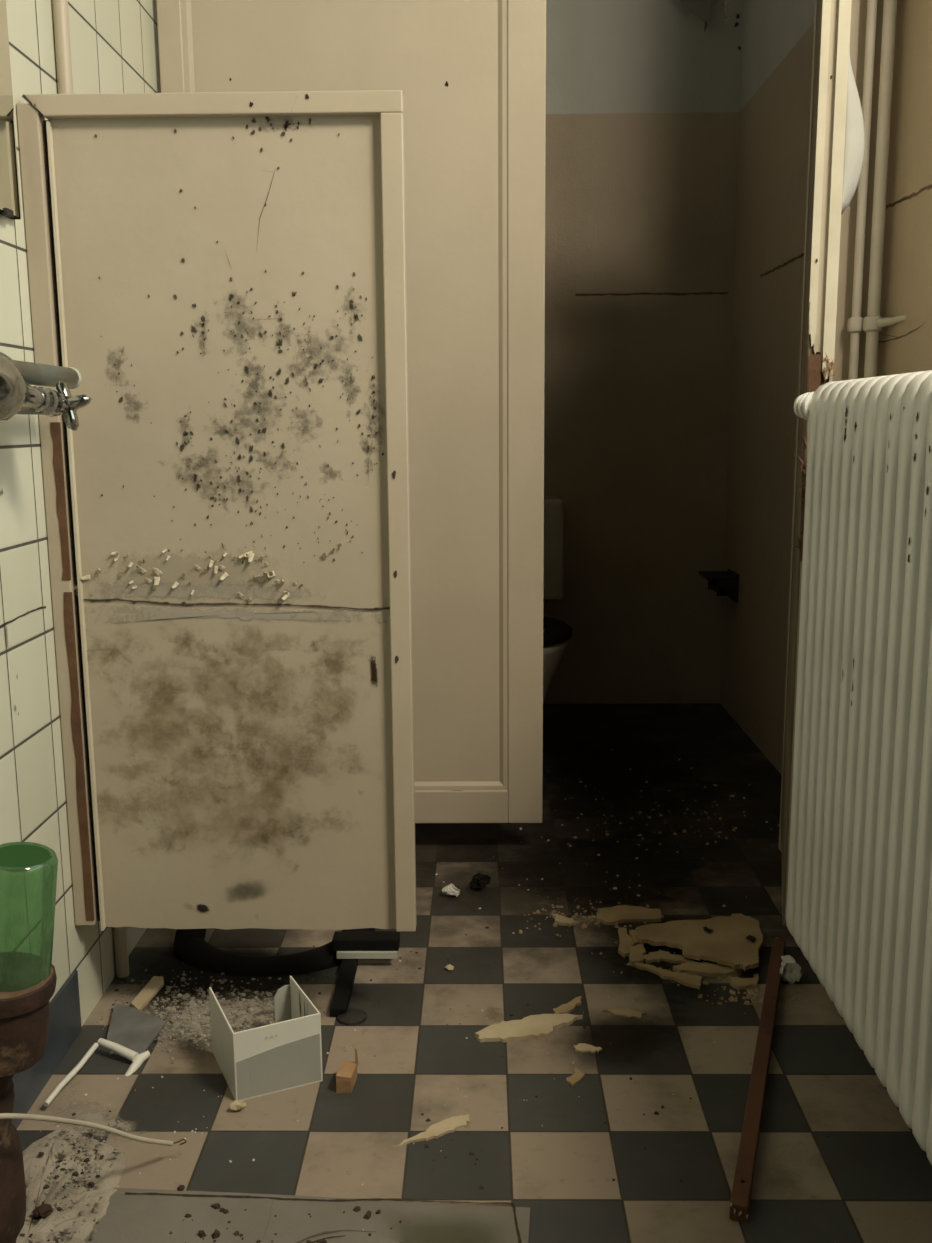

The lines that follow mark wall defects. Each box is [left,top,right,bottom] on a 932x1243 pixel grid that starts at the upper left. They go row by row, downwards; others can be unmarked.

crack [886,185,932,208]
damp [182,272,367,564]
peeling [111,548,303,600]
crack [83,598,390,611]